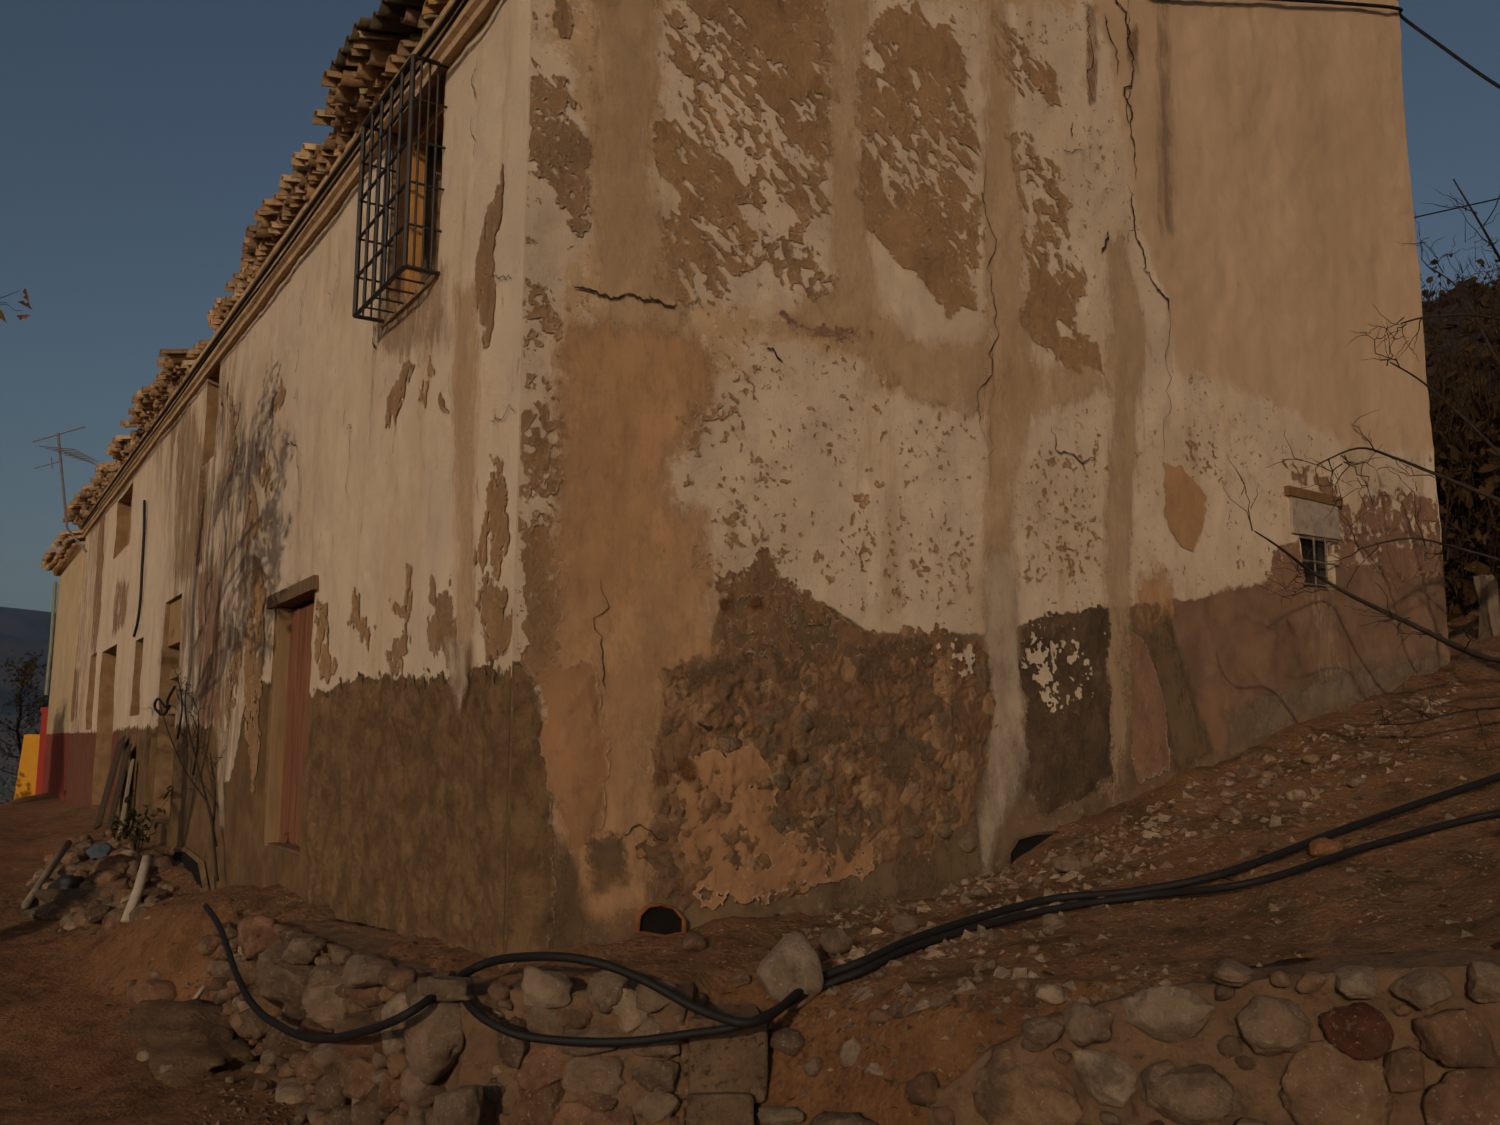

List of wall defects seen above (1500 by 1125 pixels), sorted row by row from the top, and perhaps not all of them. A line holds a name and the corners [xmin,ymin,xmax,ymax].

flaking render [304,277,570,970]
peeling [474,163,504,348]
peeling [528,54,594,237]
crack [574,286,679,309]
flaking render [676,737,874,910]
peeling [640,0,986,319]
flaking render [676,364,978,665]
water stain [756,0,1212,909]
crack [977,166,999,486]
peeling [1003,130,1105,375]
flaking render [1005,601,1170,868]
crack [1063,0,1172,448]